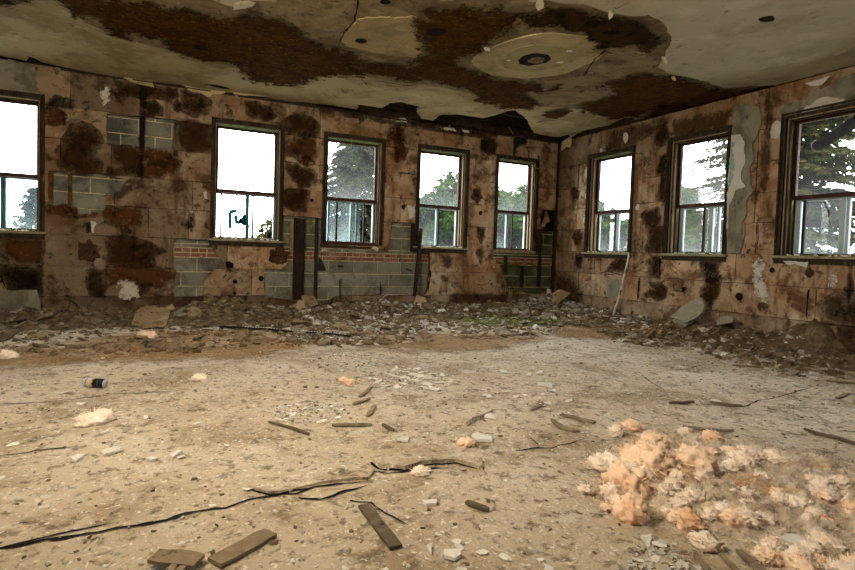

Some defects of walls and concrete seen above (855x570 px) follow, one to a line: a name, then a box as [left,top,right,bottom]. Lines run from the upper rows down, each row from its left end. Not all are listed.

spalling [60,0,769,115]
damp [46,94,75,110]
damp [54,78,212,176]
flaking render [107,115,177,150]
peeling [770,72,855,139]
flaking render [49,171,122,214]
damp [283,160,318,213]
damp [606,110,731,301]
peeling [726,134,746,233]
flaking render [259,216,428,303]
damp [699,261,721,309]
damp [816,266,855,343]